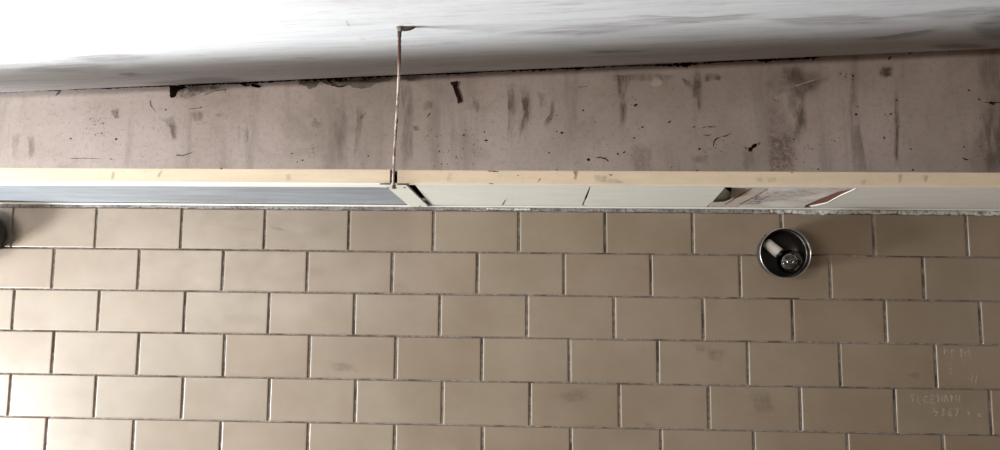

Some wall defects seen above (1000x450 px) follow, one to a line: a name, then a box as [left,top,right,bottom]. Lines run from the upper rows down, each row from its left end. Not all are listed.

peeling [295,76,415,90]
peeling [170,85,227,108]